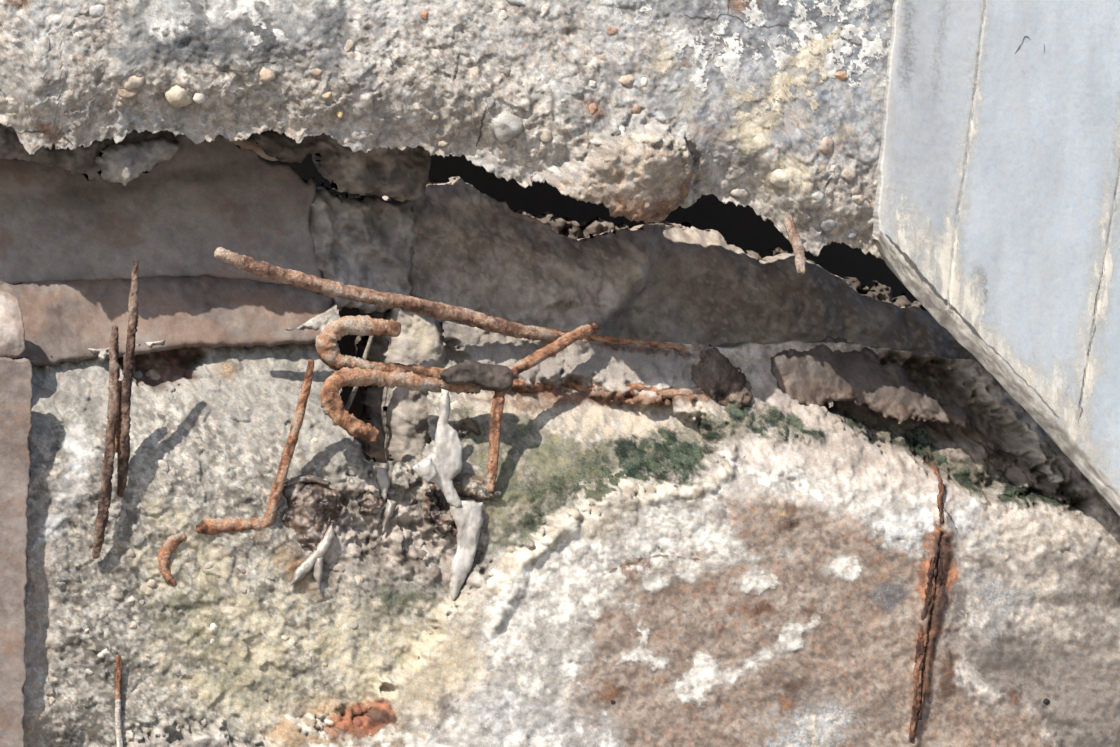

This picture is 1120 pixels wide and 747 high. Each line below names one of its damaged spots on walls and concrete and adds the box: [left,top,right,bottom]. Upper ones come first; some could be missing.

spalling [0,0,891,747]
spalling [841,276,925,311]
damp [284,443,936,747]
rust [912,521,958,698]
spalling [824,354,1082,740]
damp [952,497,999,551]
damp [1050,559,1120,605]